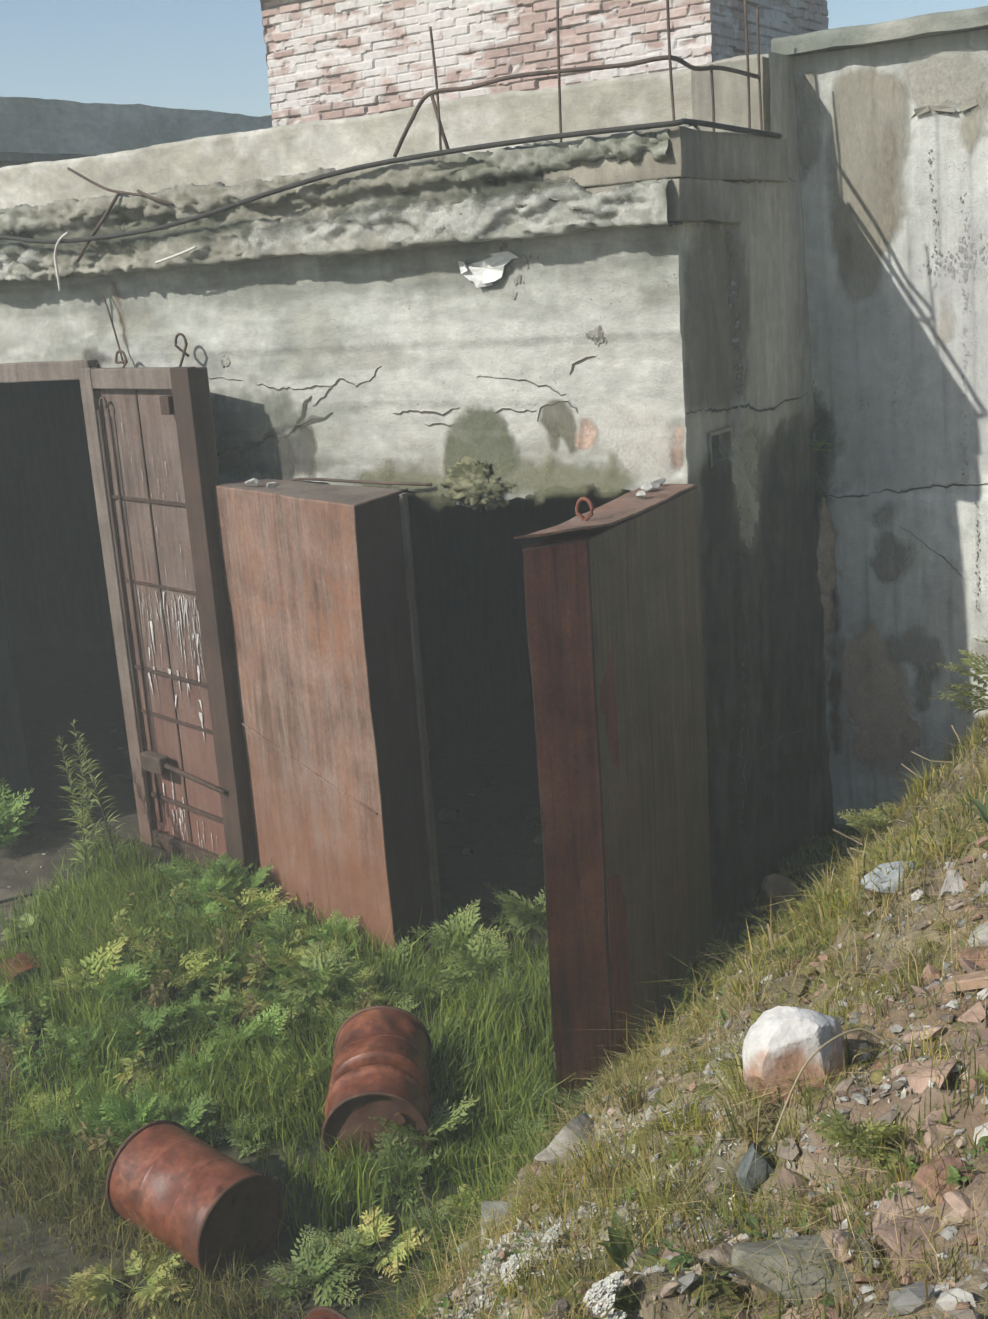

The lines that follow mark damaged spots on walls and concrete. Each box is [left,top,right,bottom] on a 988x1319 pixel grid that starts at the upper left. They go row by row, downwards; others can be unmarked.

water stain [795,70,906,298]
peeling [458,251,519,288]
water stain [213,395,316,480]
crack [208,366,381,479]
crack [393,407,459,427]
crack [476,355,595,421]
water stain [541,400,576,462]
crack [827,481,988,498]
water stain [872,507,911,583]
crack [900,526,963,577]
water stain [699,423,825,918]
water stain [883,630,940,710]